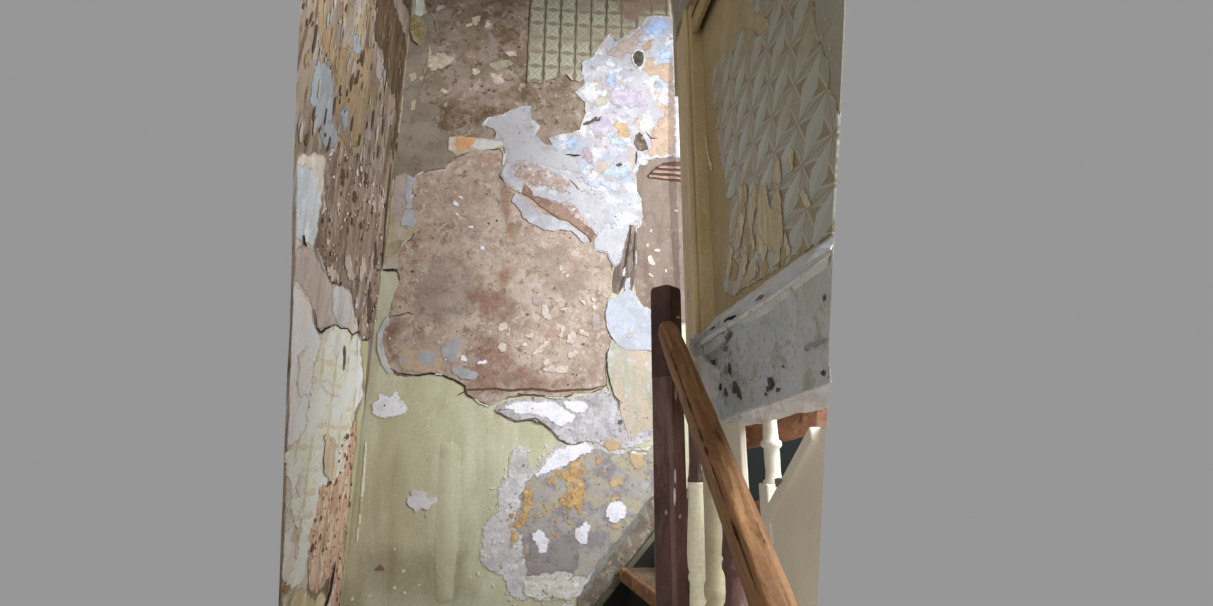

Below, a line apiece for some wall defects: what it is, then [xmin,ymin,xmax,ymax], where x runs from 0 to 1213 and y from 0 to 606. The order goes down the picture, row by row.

flaking render [815,0,846,112]
spalling [298,0,698,606]
peeling [689,335,727,420]